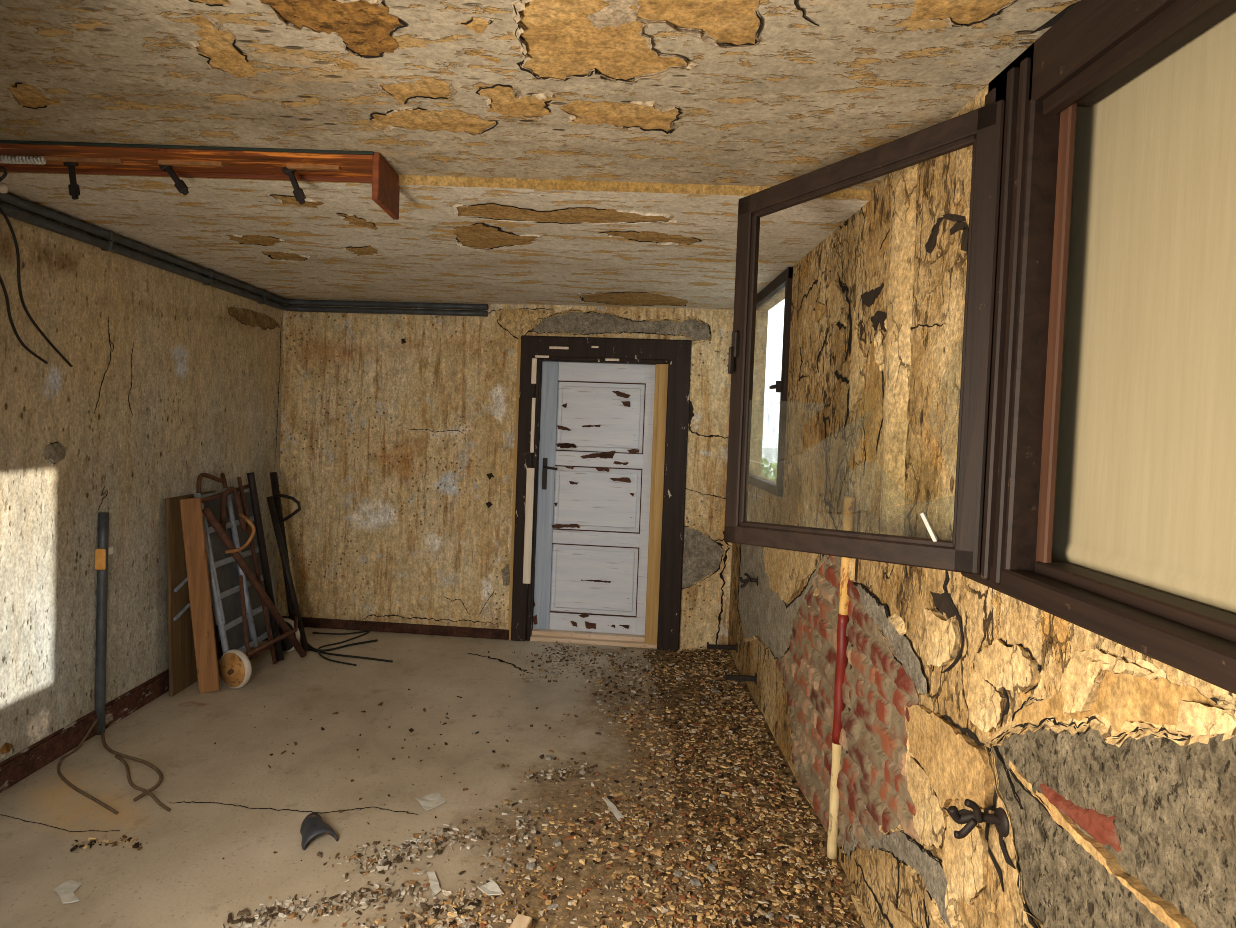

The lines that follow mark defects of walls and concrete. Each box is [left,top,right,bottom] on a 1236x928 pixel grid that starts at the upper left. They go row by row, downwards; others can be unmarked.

crack [794,0,819,26]
peeling [369,0,763,136]
peeling [226,234,311,262]
peeling [266,194,378,230]
peeling [342,245,383,257]
peeling [453,203,702,250]
flaking render [495,292,712,344]
flaking render [681,525,724,590]
flaking render [737,544,1236,928]
crack [914,644,1064,928]
crack [840,833,929,928]